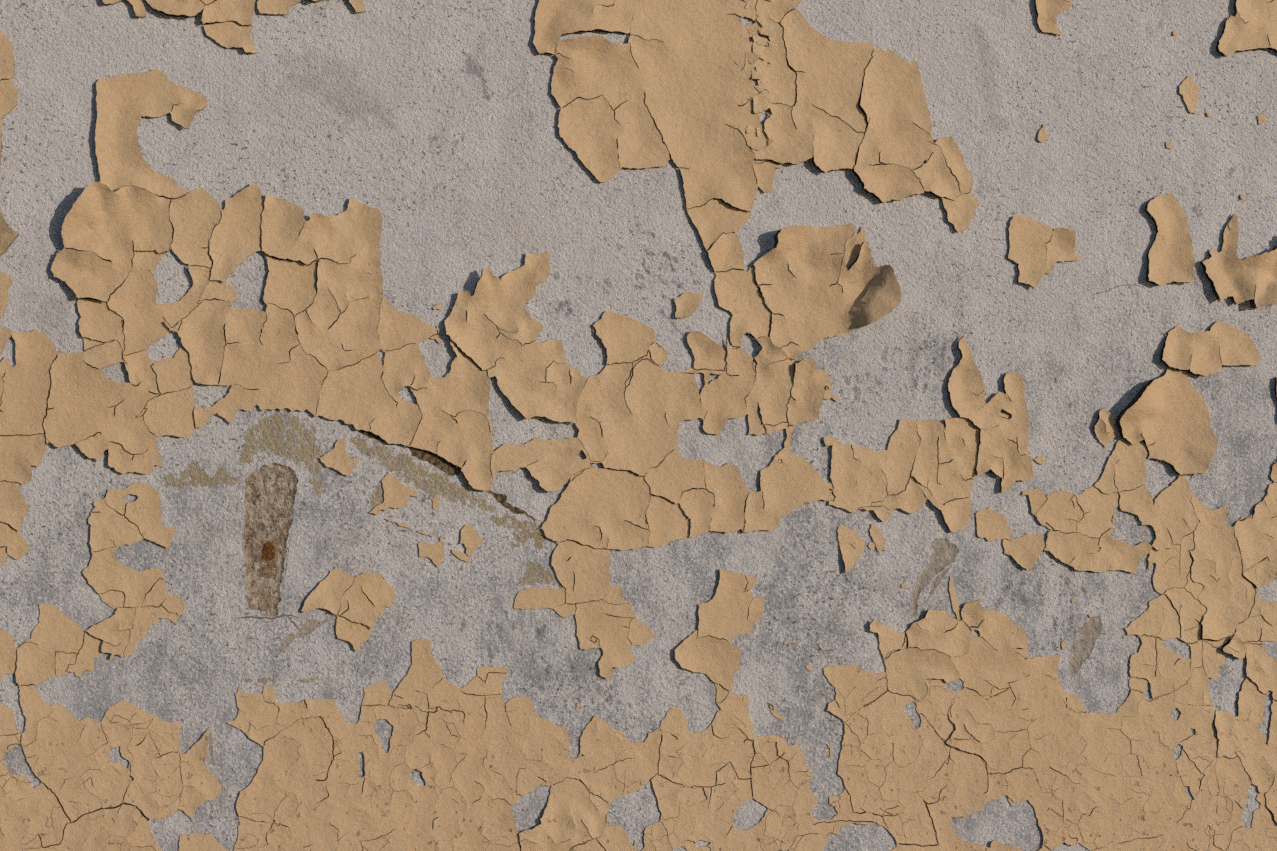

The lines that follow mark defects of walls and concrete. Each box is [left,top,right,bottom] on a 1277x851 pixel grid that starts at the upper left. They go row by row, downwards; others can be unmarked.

crack [832,53,873,164]
peeling [751,8,979,233]
peeling [0,0,903,532]
rust [260,541,276,576]
crack [357,430,461,476]
crack [487,489,536,521]
peeling [1094,367,1218,504]
crack [39,786,147,848]
peeling [226,677,661,851]
peeling [641,664,1023,851]
crack [818,793,939,847]
peeling [946,588,1277,851]